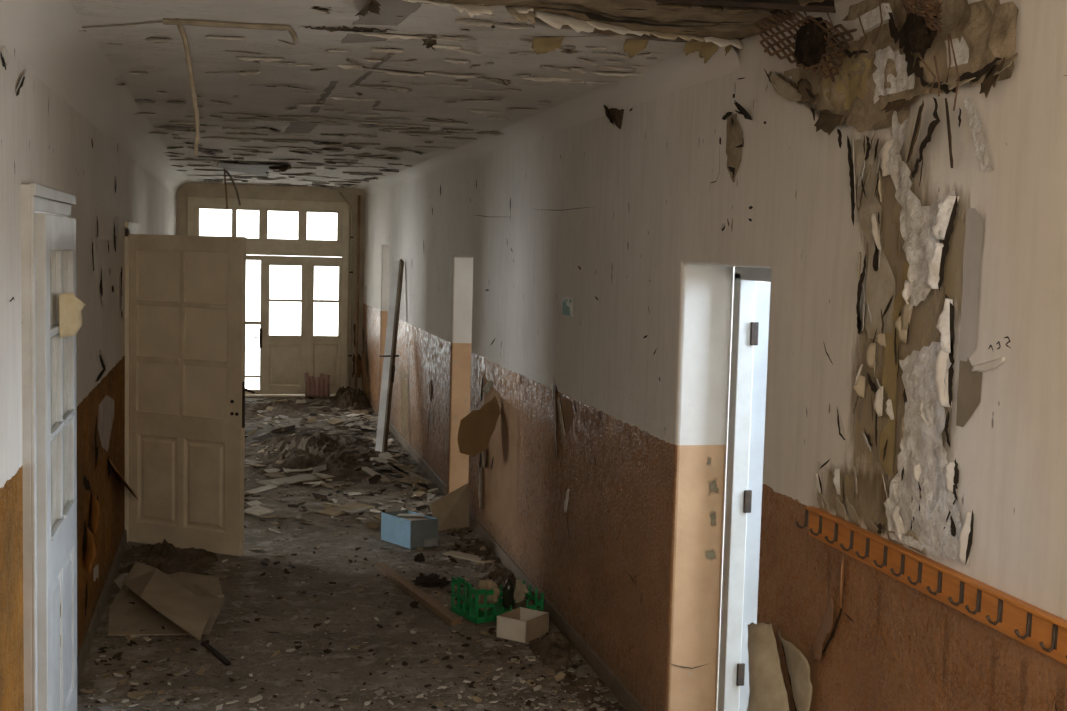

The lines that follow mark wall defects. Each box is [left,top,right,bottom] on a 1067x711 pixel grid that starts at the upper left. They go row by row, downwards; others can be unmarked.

peeling [1,45,15,70]
spalling [133,0,795,191]
peeling [764,0,1019,566]
peeling [457,376,519,530]
peeling [747,622,818,711]